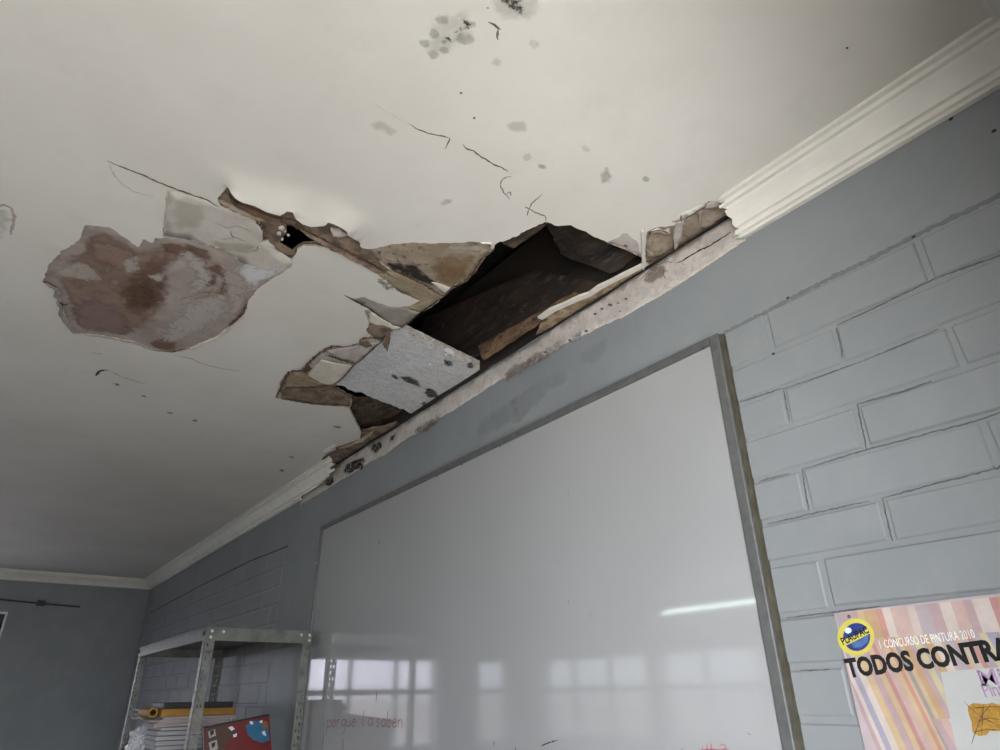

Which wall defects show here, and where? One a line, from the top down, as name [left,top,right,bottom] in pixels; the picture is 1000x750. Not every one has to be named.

crack [108,161,218,207]
crack [372,102,546,219]
peeling [42,190,293,353]
flaking render [300,218,746,505]